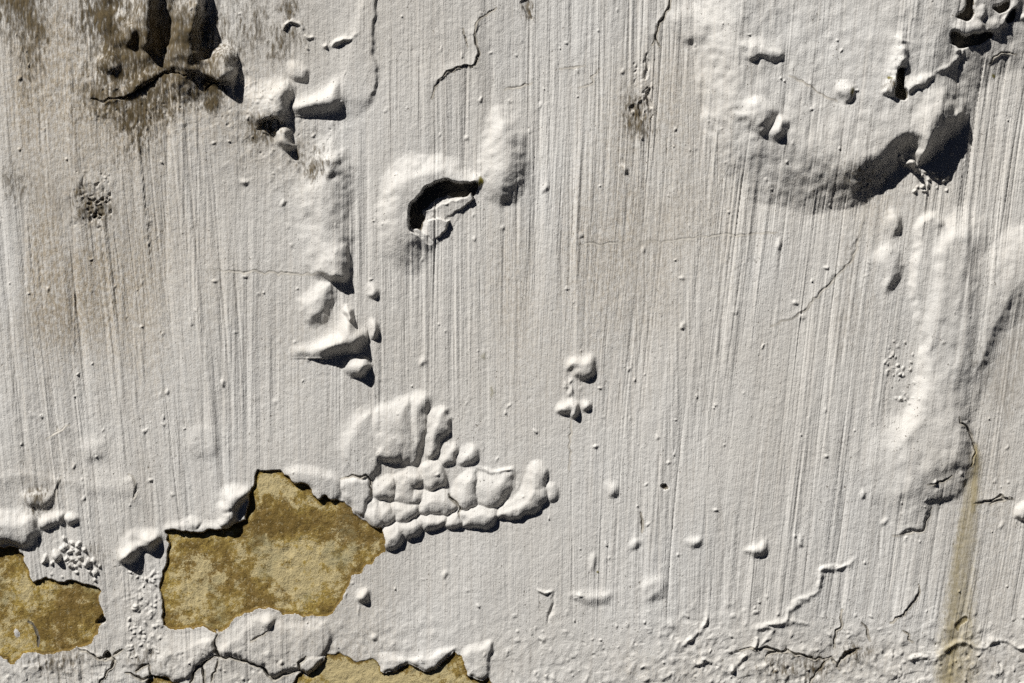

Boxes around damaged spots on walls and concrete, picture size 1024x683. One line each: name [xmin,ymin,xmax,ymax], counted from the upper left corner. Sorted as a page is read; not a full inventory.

crack [91,71,232,105]
crack [430,7,497,100]
spalling [936,0,1024,48]
crack [892,416,977,537]
peeling [116,466,386,633]
peeling [0,546,106,664]
peeling [294,640,494,683]
crack [739,583,921,683]